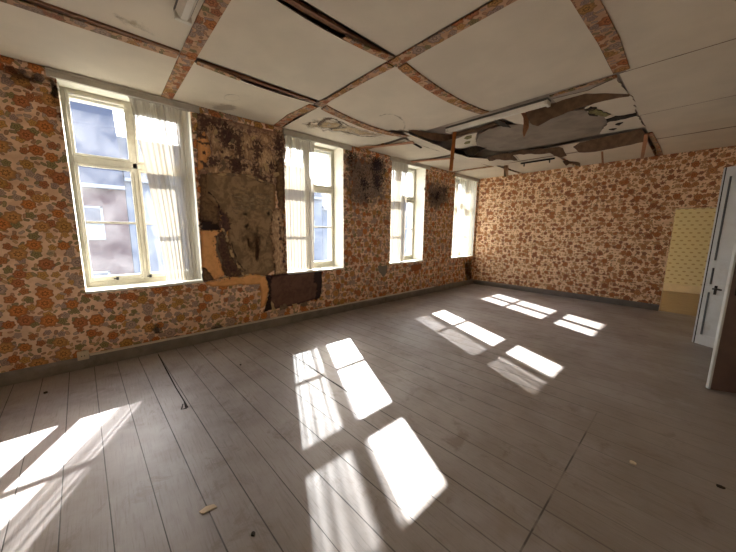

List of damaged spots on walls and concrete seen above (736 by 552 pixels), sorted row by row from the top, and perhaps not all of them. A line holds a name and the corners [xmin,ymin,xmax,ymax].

flaking render [205,173,275,276]
leakage [196,113,287,190]
leakage [345,152,386,205]
leakage [424,179,448,209]